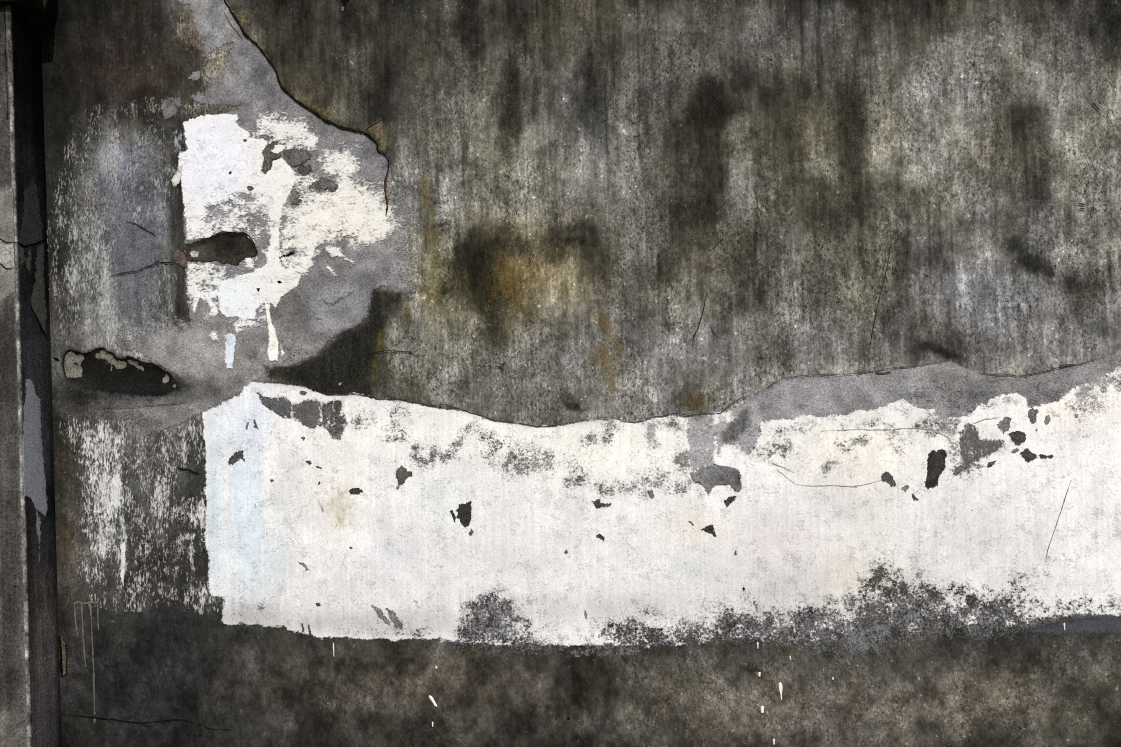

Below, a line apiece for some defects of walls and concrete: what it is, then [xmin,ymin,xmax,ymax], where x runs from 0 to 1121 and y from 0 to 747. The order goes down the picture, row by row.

crack [223,0,389,216]
peeling [171,165,183,187]
crack [0,238,45,269]
damp [1009,239,1075,285]
peeling [64,351,84,378]
peeling [294,400,344,436]
flaking render [684,349,1121,471]
peeling [23,379,48,562]
peeling [691,465,742,493]
spalling [924,448,947,489]
spalling [456,501,472,527]
damp [74,601,99,667]